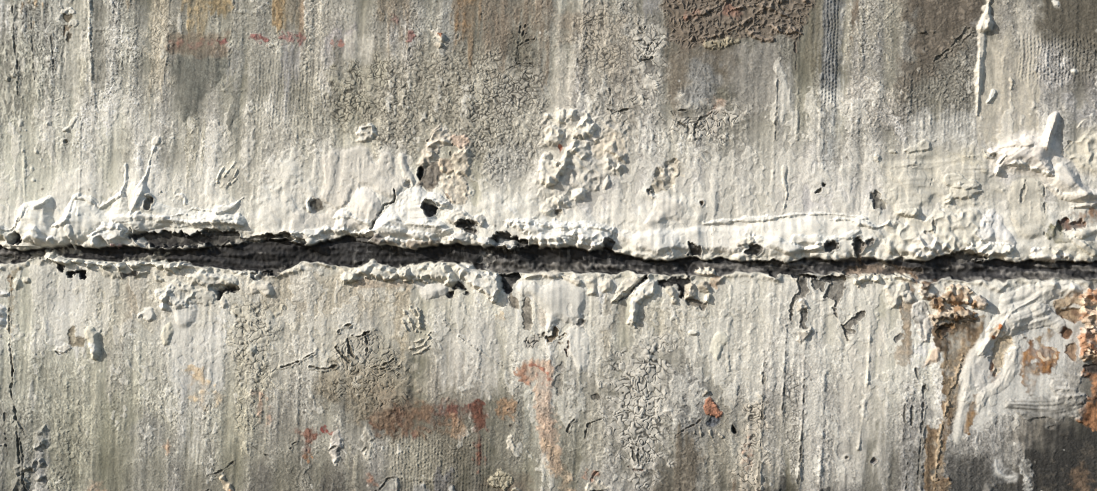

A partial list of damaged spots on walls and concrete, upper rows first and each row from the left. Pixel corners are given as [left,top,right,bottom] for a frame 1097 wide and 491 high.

peeling [660,0,816,69]
leakage [168,54,228,122]
flaking render [405,126,472,205]
corrosion [363,397,517,466]
corrosion [514,358,576,491]
crack [0,188,1097,491]
flaking render [789,274,865,343]
corrosion [894,272,918,367]
corrosion [923,284,988,491]
corrosion [988,289,1097,431]
leakage [1019,432,1097,491]
corrosion [1068,461,1097,491]